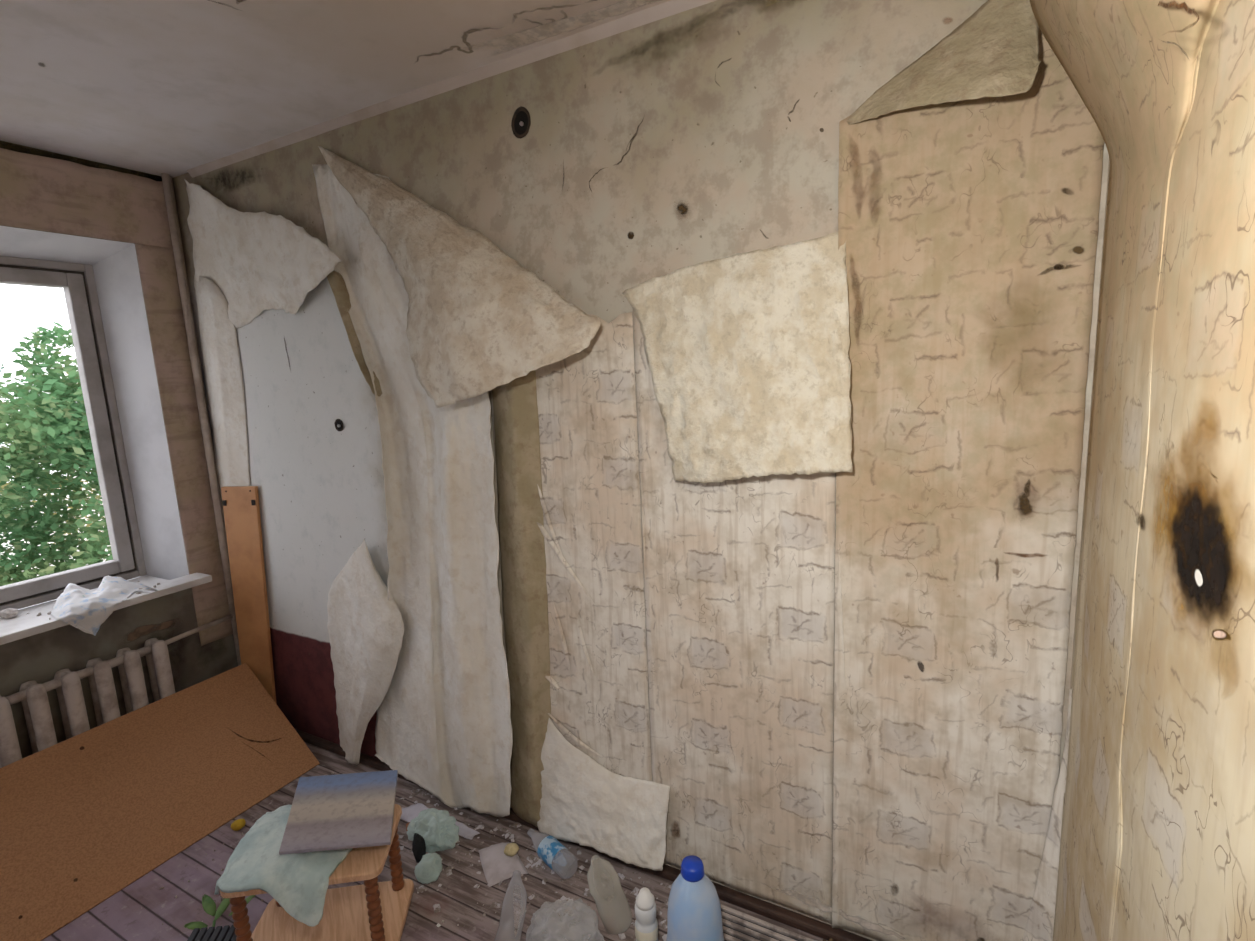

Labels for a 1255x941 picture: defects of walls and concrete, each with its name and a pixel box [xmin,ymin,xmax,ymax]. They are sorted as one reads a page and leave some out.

leakage [425,28,494,56]